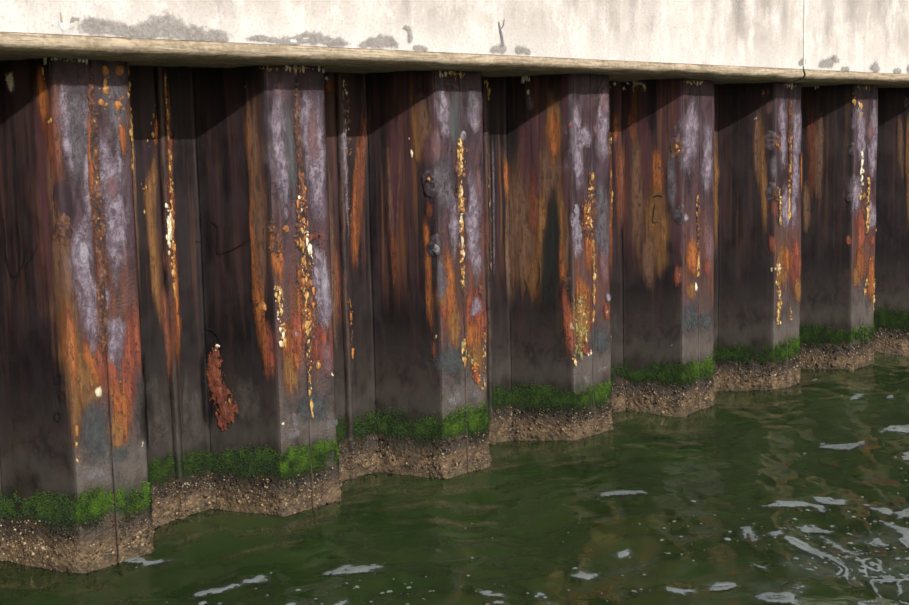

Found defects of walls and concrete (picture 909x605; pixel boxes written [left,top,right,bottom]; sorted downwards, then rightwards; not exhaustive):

damp [403,25,428,51]
corrosion [35,63,180,449]
corrosion [247,71,355,418]
corrosion [324,76,367,262]
corrosion [425,130,487,390]
corrosion [484,98,611,366]
corrosion [609,109,718,331]
corrosion [753,90,773,222]
corrosion [770,237,801,325]
corrosion [846,152,877,309]
corrosion [897,116,909,214]
corrosion [201,344,238,431]